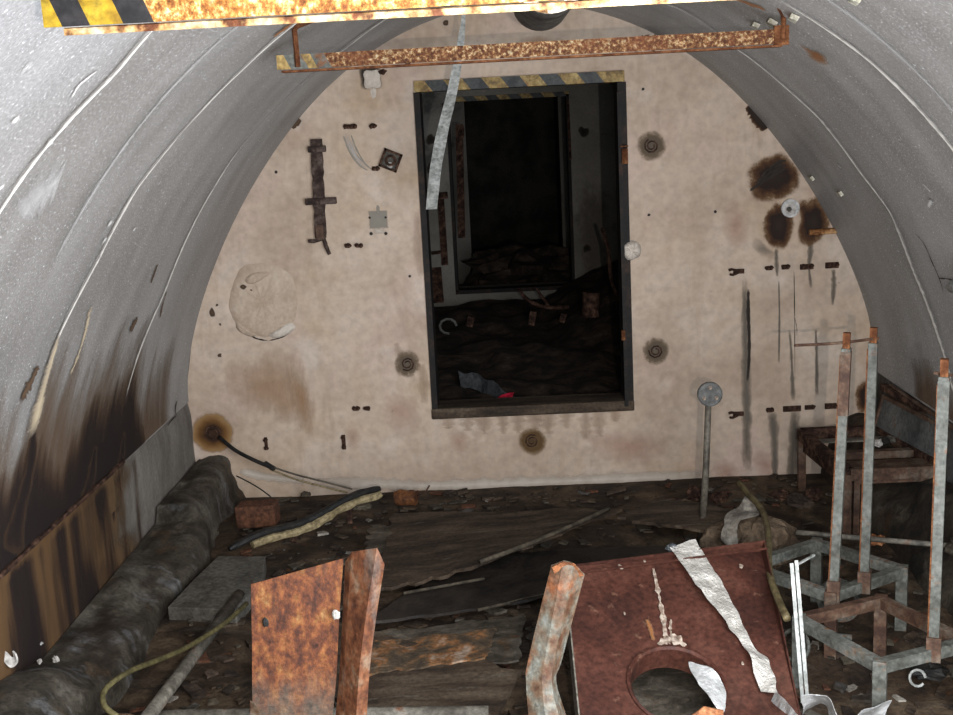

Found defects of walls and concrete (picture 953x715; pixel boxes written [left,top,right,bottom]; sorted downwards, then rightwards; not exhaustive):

leakage [0,338,167,554]
leakage [916,375,936,410]
rust [0,466,138,681]